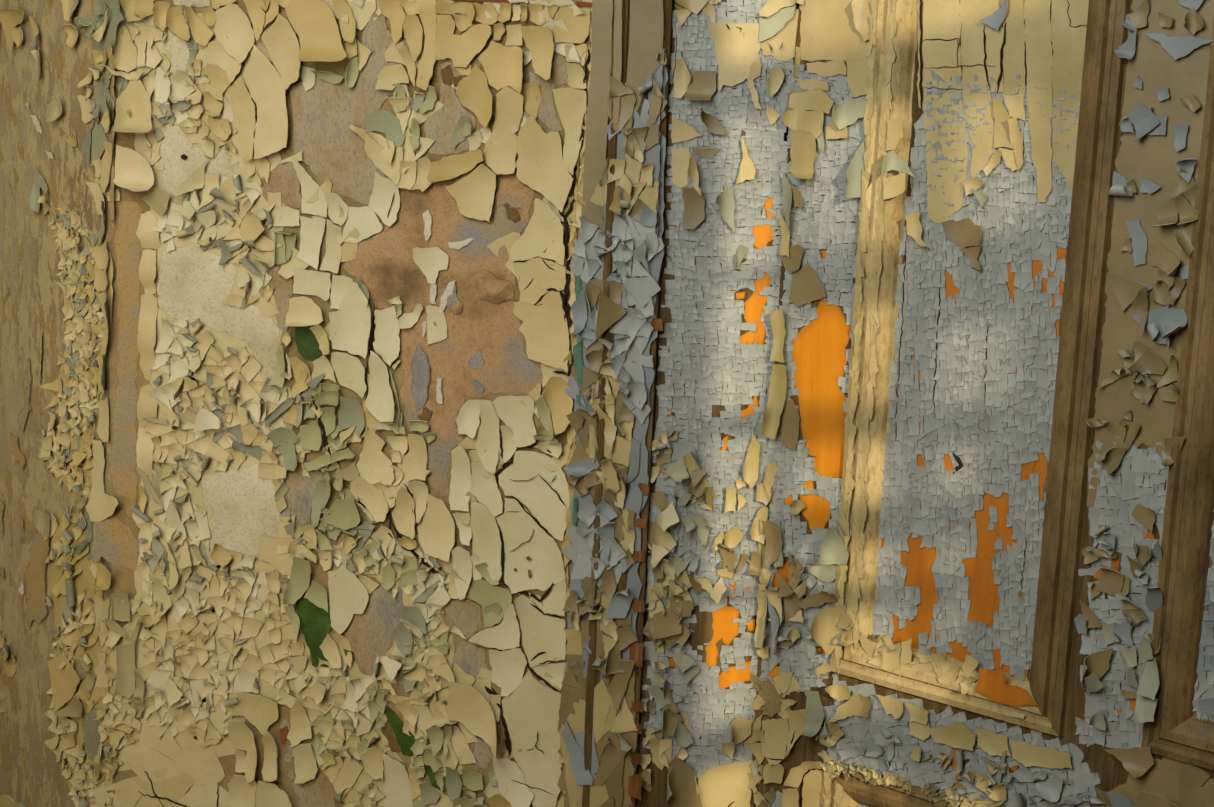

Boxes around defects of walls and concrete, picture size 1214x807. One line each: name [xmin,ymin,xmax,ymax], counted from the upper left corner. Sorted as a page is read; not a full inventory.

peeling [0,8,41,83]
peeling [905,0,1089,270]
flaking render [26,0,668,807]
peeling [643,0,1037,707]
peeling [1043,281,1064,340]
peeling [1086,0,1214,507]
crack [140,771,188,807]
crack [492,646,561,693]
crack [495,428,566,619]
peeling [640,651,914,807]
peeling [876,694,1214,807]
peeling [1074,505,1163,732]